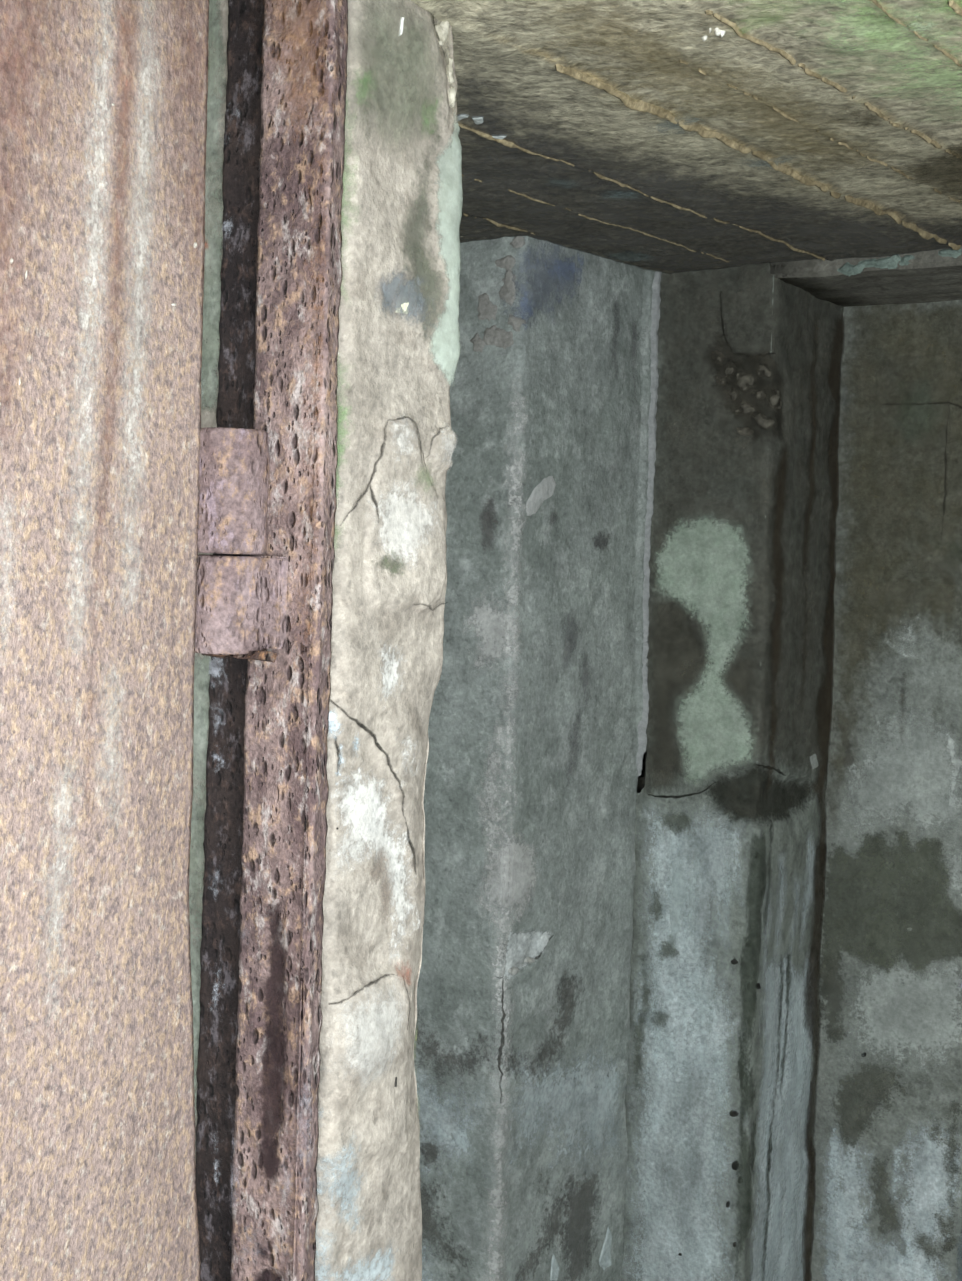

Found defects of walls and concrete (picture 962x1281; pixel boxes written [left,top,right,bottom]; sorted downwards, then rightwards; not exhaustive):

crack [343,416,442,522]
crack [331,700,417,874]
leakage [457,80,962,1281]
leakage [414,976,620,1281]